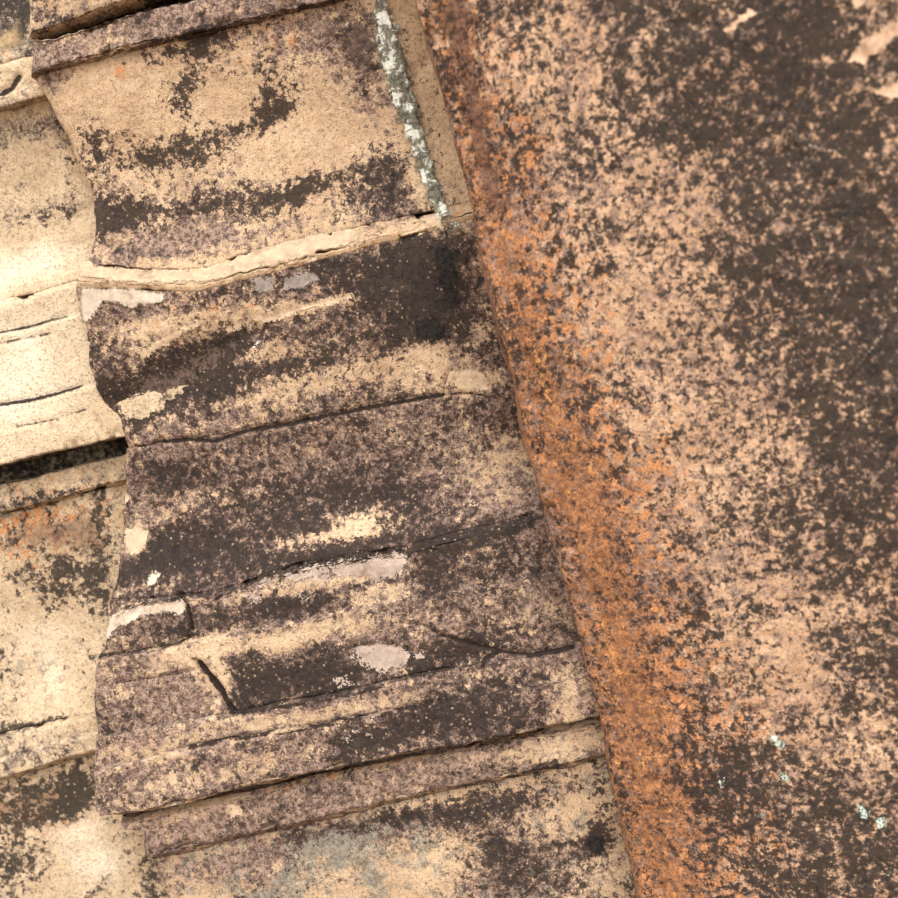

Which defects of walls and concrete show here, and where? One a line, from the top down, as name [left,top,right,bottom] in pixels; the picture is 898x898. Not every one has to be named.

leakage [98,234,180,262]
spalling [75,229,360,322]
leakage [428,226,469,308]
crack [0,316,67,343]
leakage [408,311,454,348]
crack [0,385,86,427]
rust [416,0,714,898]
spalling [244,550,407,604]
spalling [106,599,186,639]
spalling [350,640,425,676]
crack [407,622,575,668]
crack [126,659,453,749]